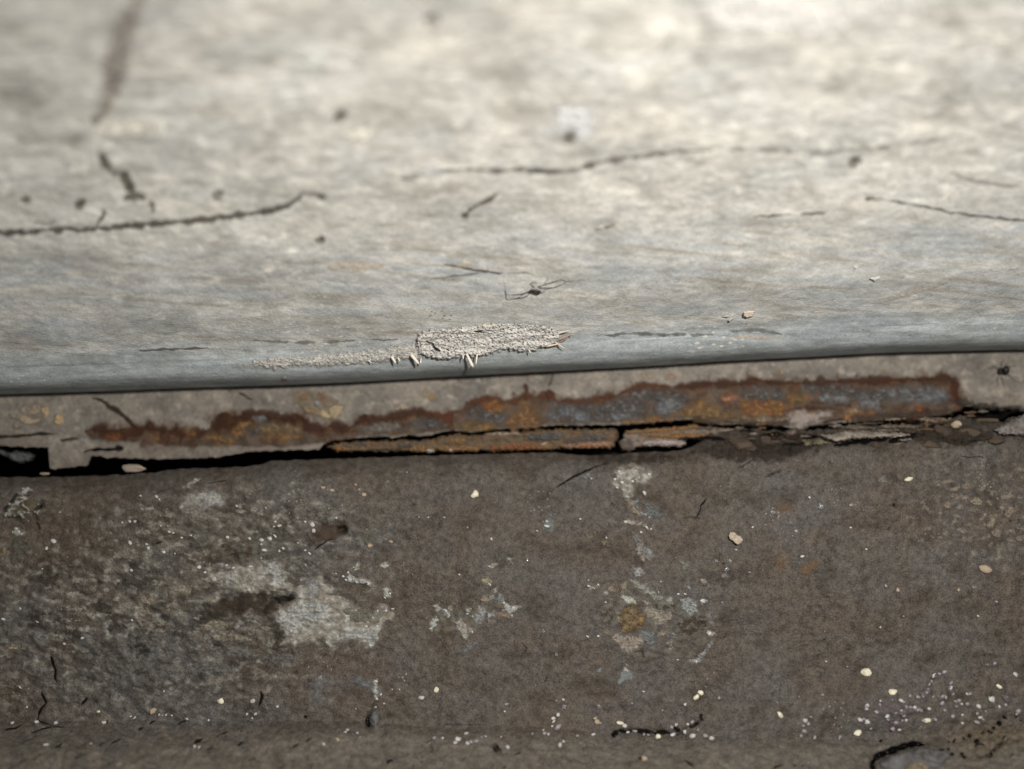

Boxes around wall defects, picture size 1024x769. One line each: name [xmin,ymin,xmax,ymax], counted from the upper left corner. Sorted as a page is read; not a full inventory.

crack [0,195,301,236]
crack [0,398,135,453]
rust [86,373,962,447]
crack [678,408,1020,458]
peeling [829,417,938,446]
peeling [993,414,1024,436]
crack [552,463,605,491]
damp [62,478,395,692]